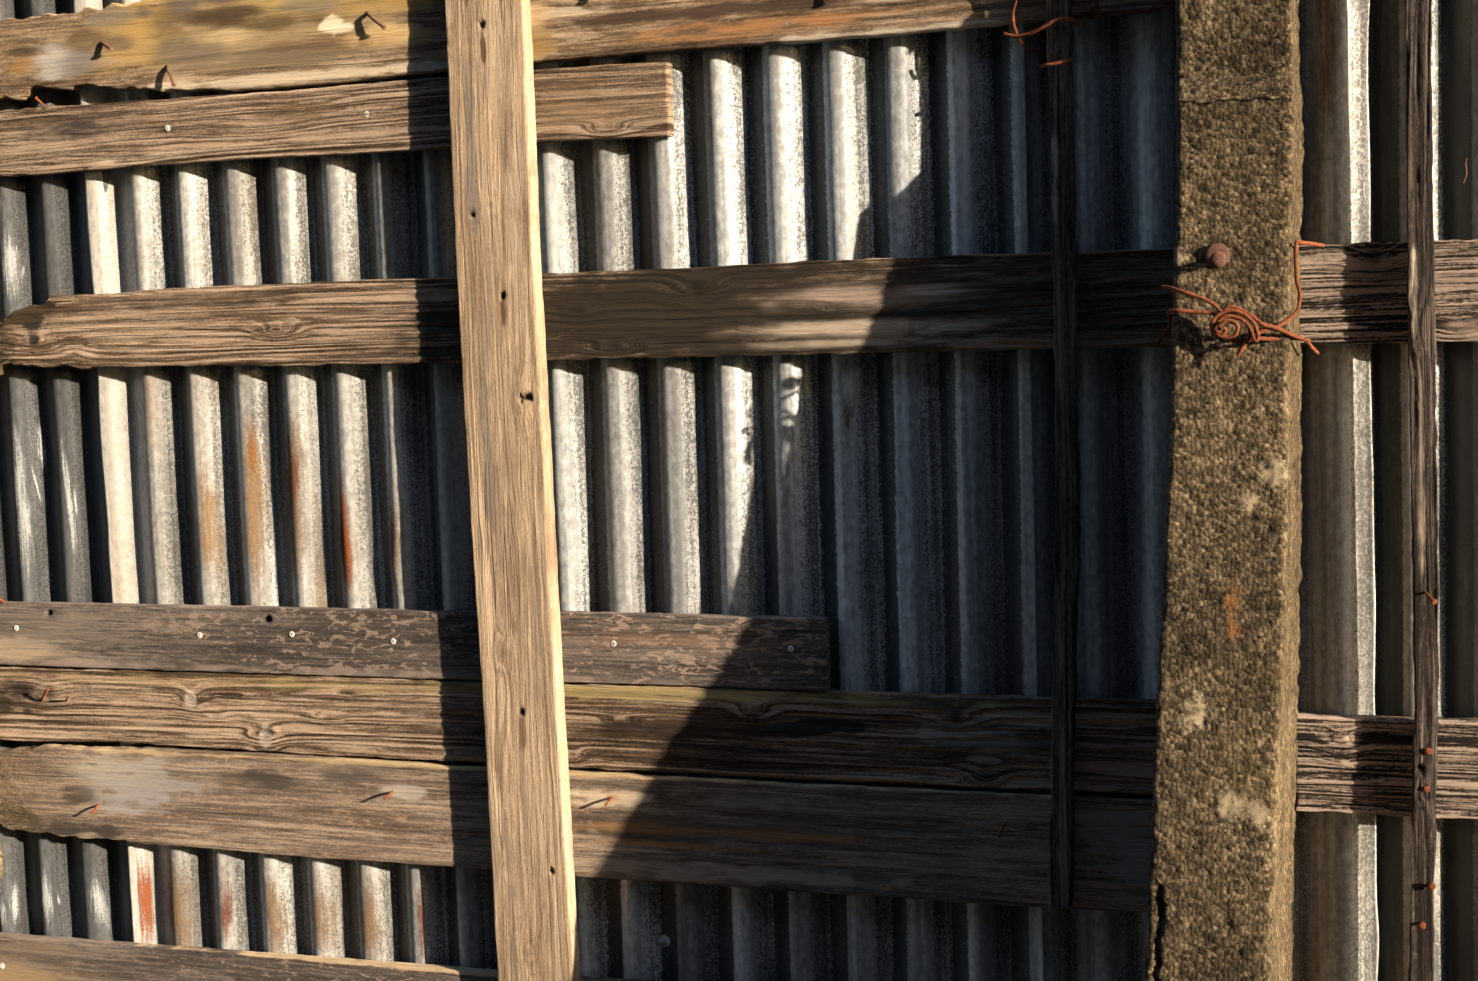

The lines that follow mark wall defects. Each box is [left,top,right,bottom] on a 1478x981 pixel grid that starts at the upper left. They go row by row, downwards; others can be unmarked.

corrosion [244,434,267,572]
corrosion [285,423,304,572]
corrosion [339,485,352,584]
corrosion [137,861,192,946]